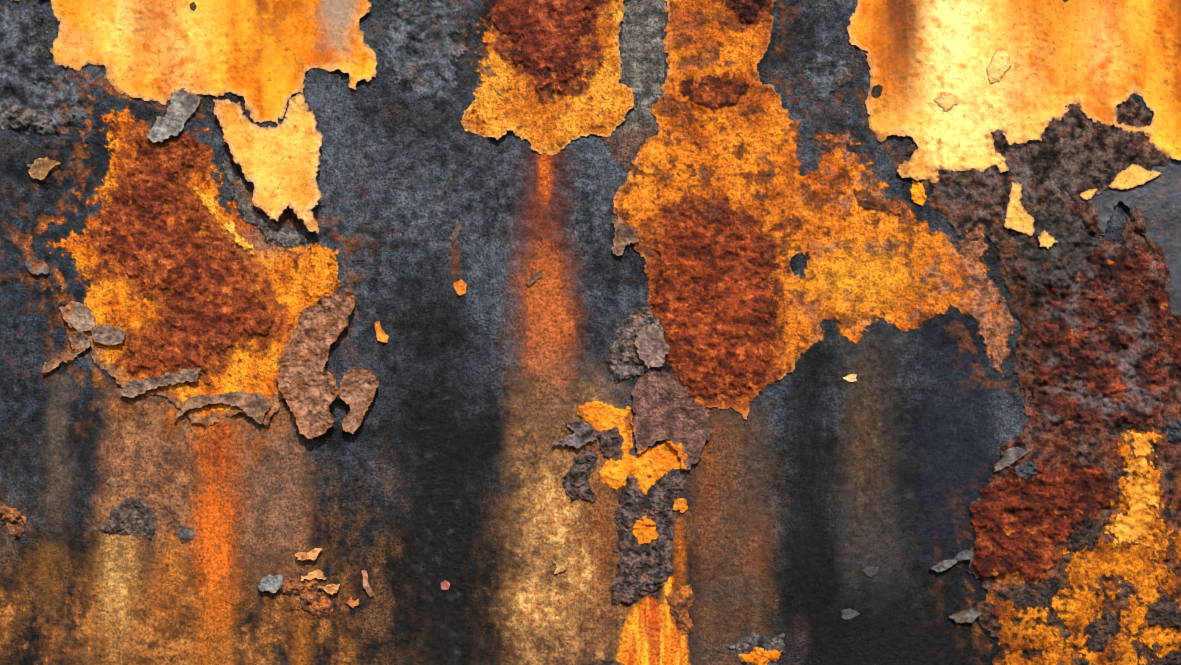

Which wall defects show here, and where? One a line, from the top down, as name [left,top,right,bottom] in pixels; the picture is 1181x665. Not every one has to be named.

peeling [27,157,61,180]
peeling [50,0,377,247]
peeling [847,0,1181,249]
corrosion [22,106,379,665]
leakage [398,306,495,665]
leakage [786,350,837,603]
corrosion [460,0,1181,665]
leakage [847,338,894,561]
leakage [923,337,990,547]
corrosion [0,590,26,649]
leakage [810,604,1003,665]